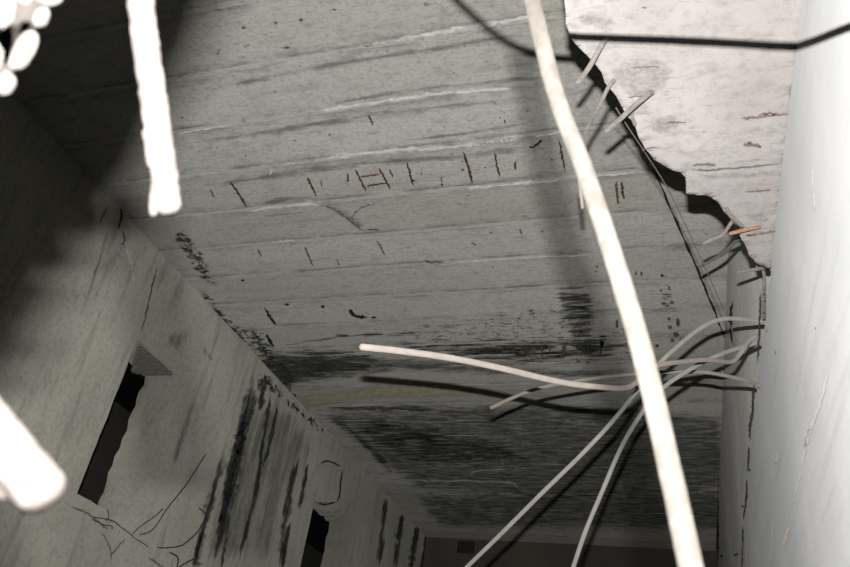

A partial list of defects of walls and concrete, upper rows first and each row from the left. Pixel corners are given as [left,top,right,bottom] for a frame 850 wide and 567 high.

spalling [575,36,609,85]
spalling [604,89,654,133]
corrosion [347,169,393,191]
water stain [176,232,400,283]
spalling [701,207,767,267]
crack [755,293,763,358]
spalling [131,344,172,376]
water stain [192,285,669,567]
crack [318,460,343,505]
water stain [670,417,721,527]
crack [716,385,755,567]
crack [72,507,124,557]